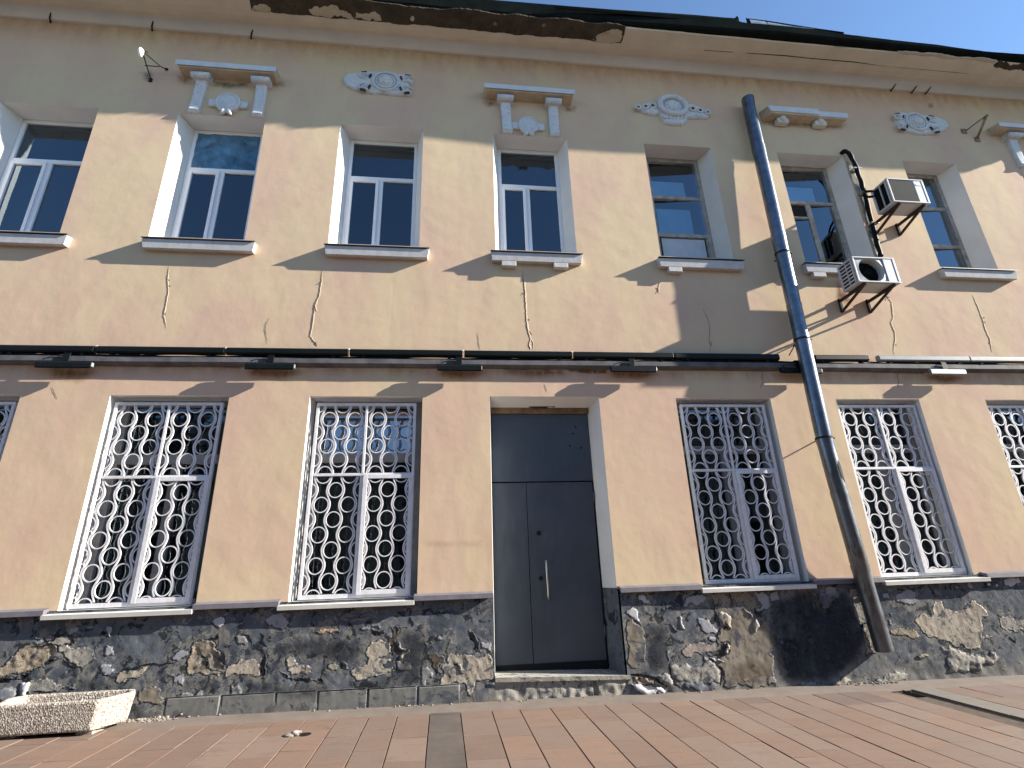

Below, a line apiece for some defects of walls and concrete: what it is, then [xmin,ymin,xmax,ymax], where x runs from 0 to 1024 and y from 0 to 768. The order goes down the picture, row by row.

peeling [250,0,626,44]
crack [309,270,323,347]
crack [520,271,534,350]
crack [885,296,899,387]
crack [972,295,992,352]
flaking render [0,626,261,705]
flaking render [285,656,312,676]
flaking render [327,624,494,697]
flaking render [624,590,783,695]
peeling [799,676,852,686]
peeling [808,586,876,655]
flaking render [881,577,1024,650]